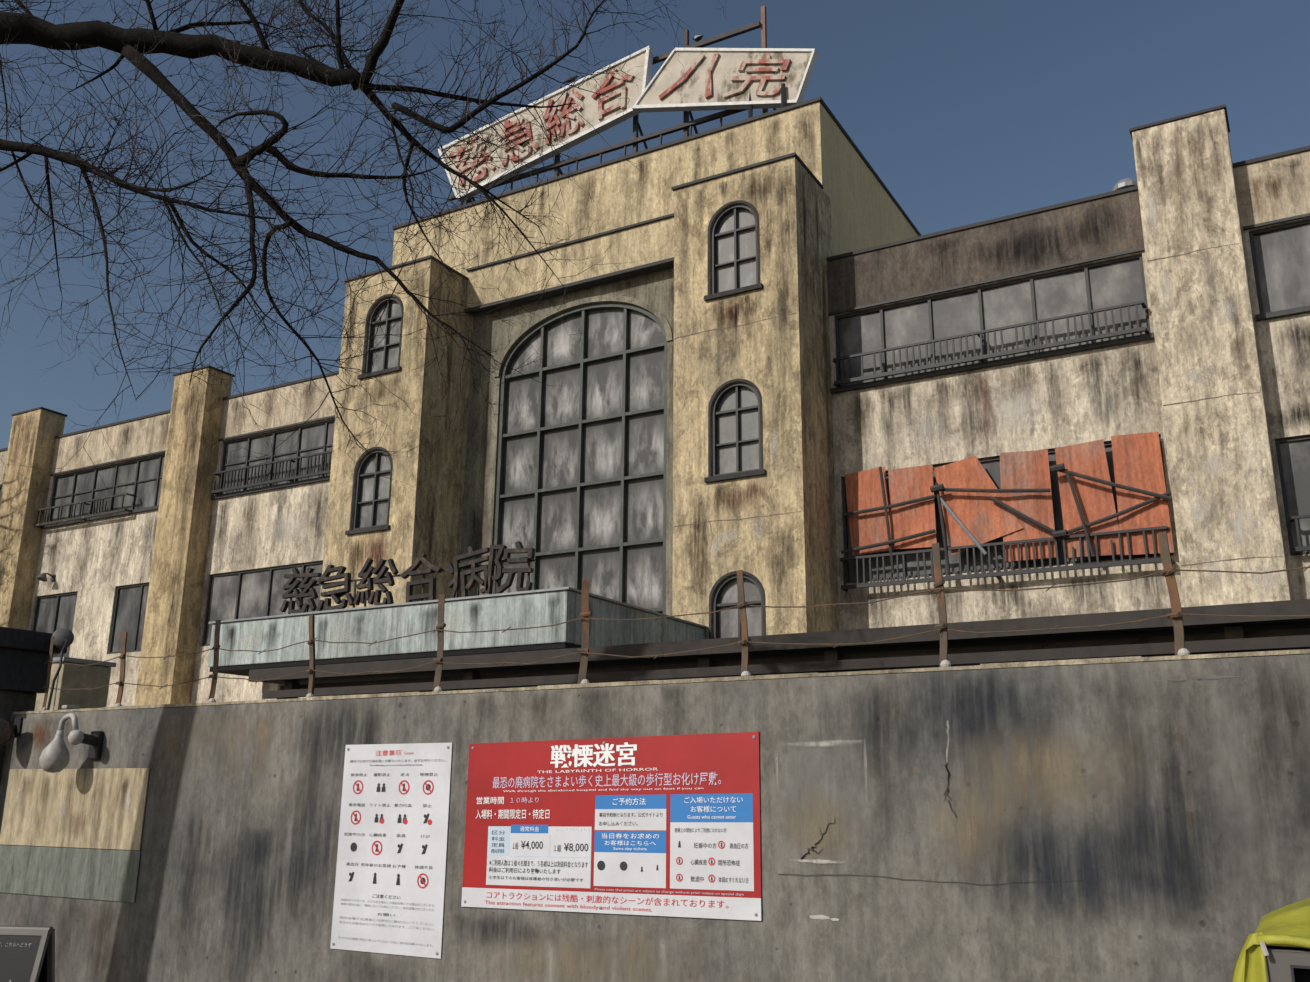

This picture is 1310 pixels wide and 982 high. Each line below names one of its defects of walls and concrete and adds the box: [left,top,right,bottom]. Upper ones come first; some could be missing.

crack [943,763,957,818]
crack [778,818,1080,885]